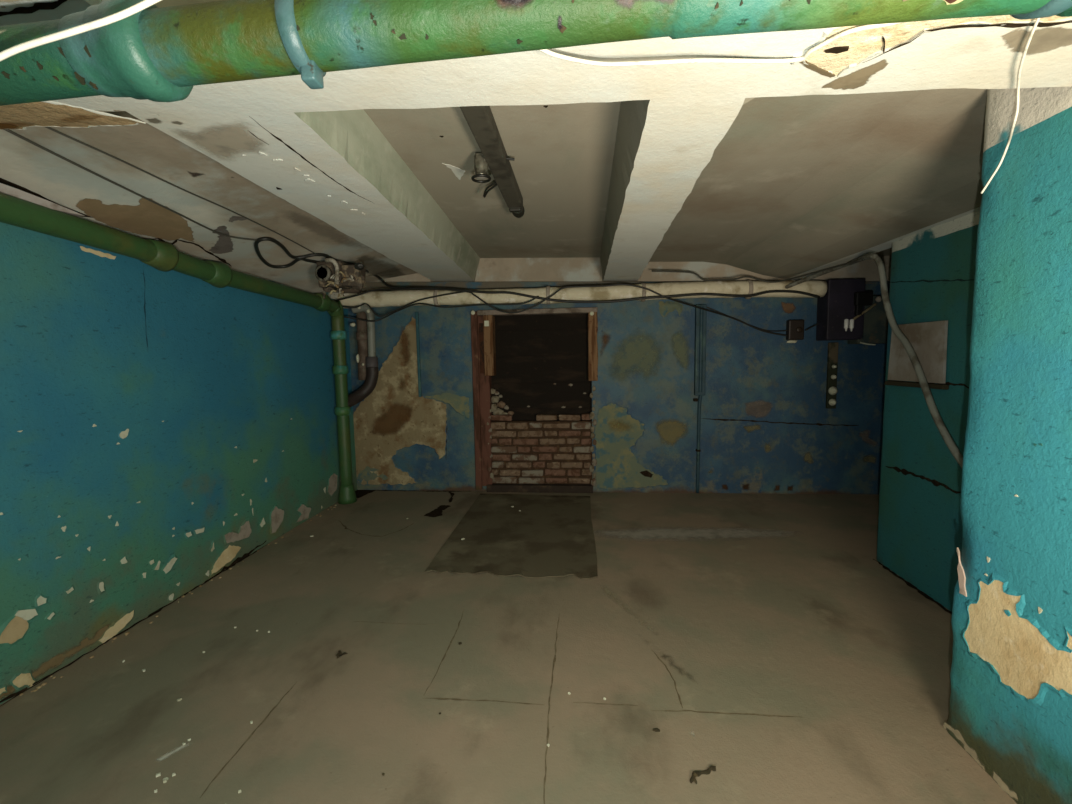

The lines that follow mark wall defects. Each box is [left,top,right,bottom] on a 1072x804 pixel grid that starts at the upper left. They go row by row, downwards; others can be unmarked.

spalling [0,0,67,16]
spalling [790,15,1072,78]
damp [1002,27,1072,55]
spalling [0,101,283,162]
crack [249,116,373,203]
damp [76,198,194,242]
flaking render [353,315,471,490]
crack [886,466,961,494]
peeling [172,494,323,577]
peeling [0,593,56,647]
flaking render [0,609,135,700]
peeling [957,547,1072,706]